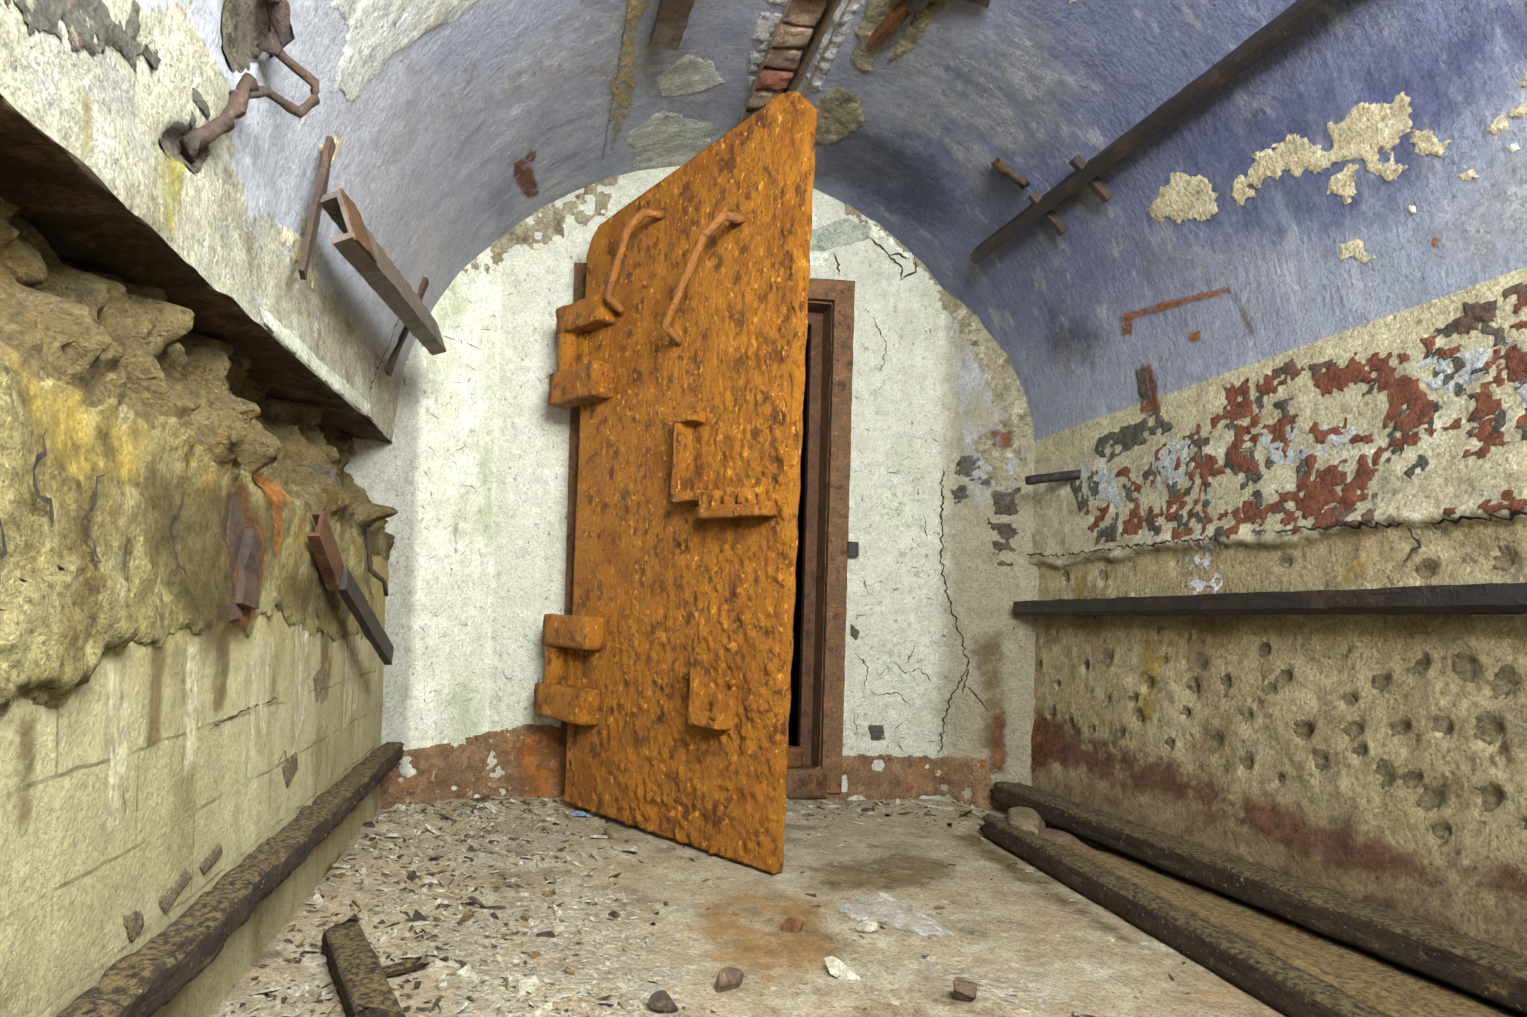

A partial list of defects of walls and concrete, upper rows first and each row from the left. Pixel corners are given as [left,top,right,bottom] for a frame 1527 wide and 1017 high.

peeling [4,0,161,75]
spalling [220,0,270,73]
peeling [331,0,479,106]
peeling [461,54,725,274]
peeling [1148,91,1451,224]
peeling [1070,282,1527,569]
crack [0,518,8,581]
crack [33,428,105,567]
crack [170,500,188,577]
crack [854,429,989,753]
leakage [1030,709,1063,772]
flaking render [159,843,223,914]